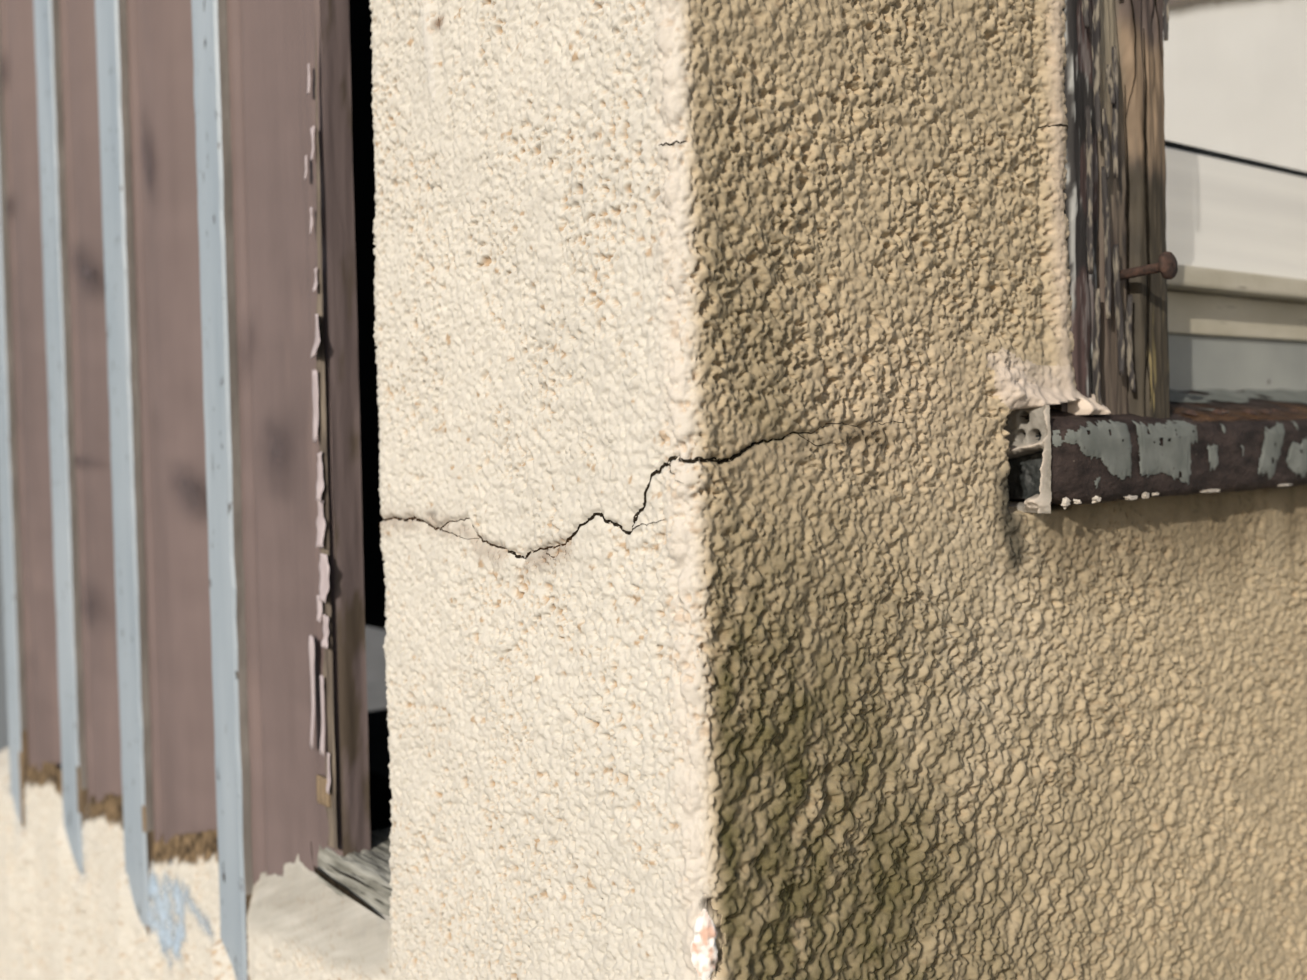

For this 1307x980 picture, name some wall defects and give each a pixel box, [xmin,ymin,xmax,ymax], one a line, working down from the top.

peeling [304,12,338,850]
crack [383,421,903,560]
spalling [986,0,1307,515]